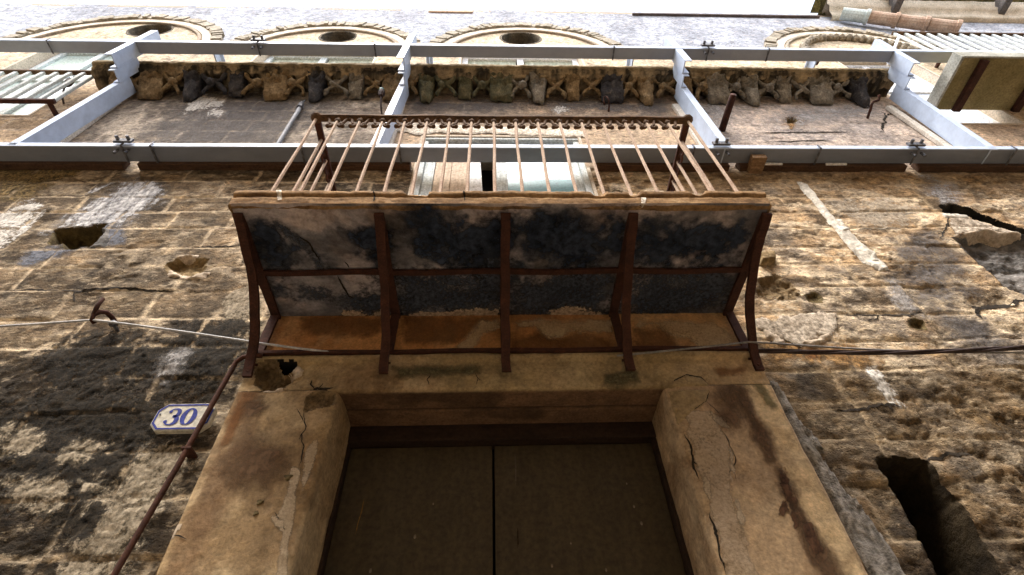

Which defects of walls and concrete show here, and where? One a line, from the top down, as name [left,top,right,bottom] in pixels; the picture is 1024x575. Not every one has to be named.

spalling [47,223,110,250]
spalling [164,254,210,280]
spalling [952,228,1024,294]
spalling [253,359,304,393]
crack [297,381,334,468]
crack [674,374,736,479]
damp [717,385,844,575]
crack [709,513,726,573]